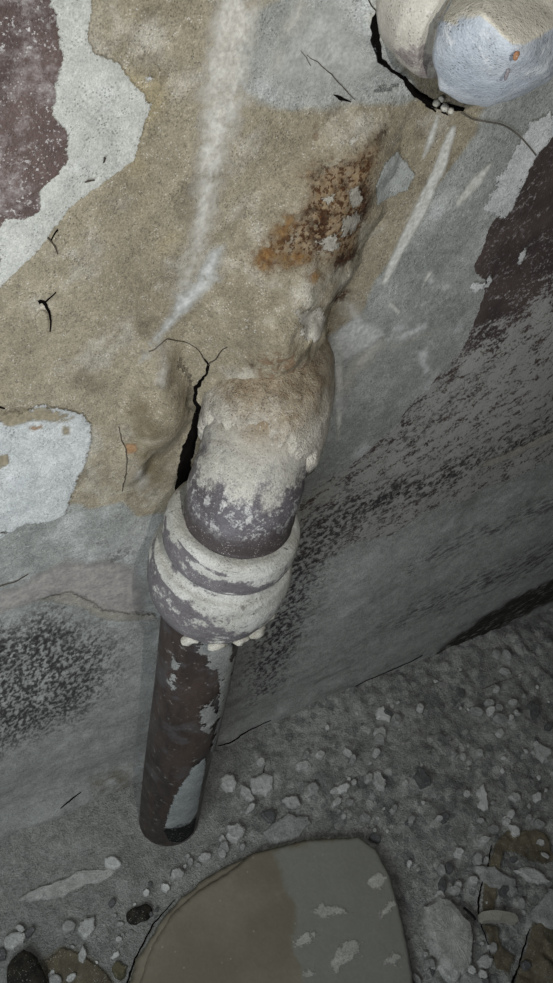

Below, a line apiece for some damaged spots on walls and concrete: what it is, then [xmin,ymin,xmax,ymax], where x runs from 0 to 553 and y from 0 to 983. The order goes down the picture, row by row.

damp [277,8,361,83]
crack [35,292,56,333]
flaking render [0,0,370,539]
damp [155,0,255,339]
corrosion [296,307,326,343]
corrosion [257,148,377,268]
flaking render [327,78,518,341]
peeling [484,111,553,219]
crack [149,338,227,491]
damp [253,428,553,695]
damp [0,624,105,744]
crack [477,845,492,955]